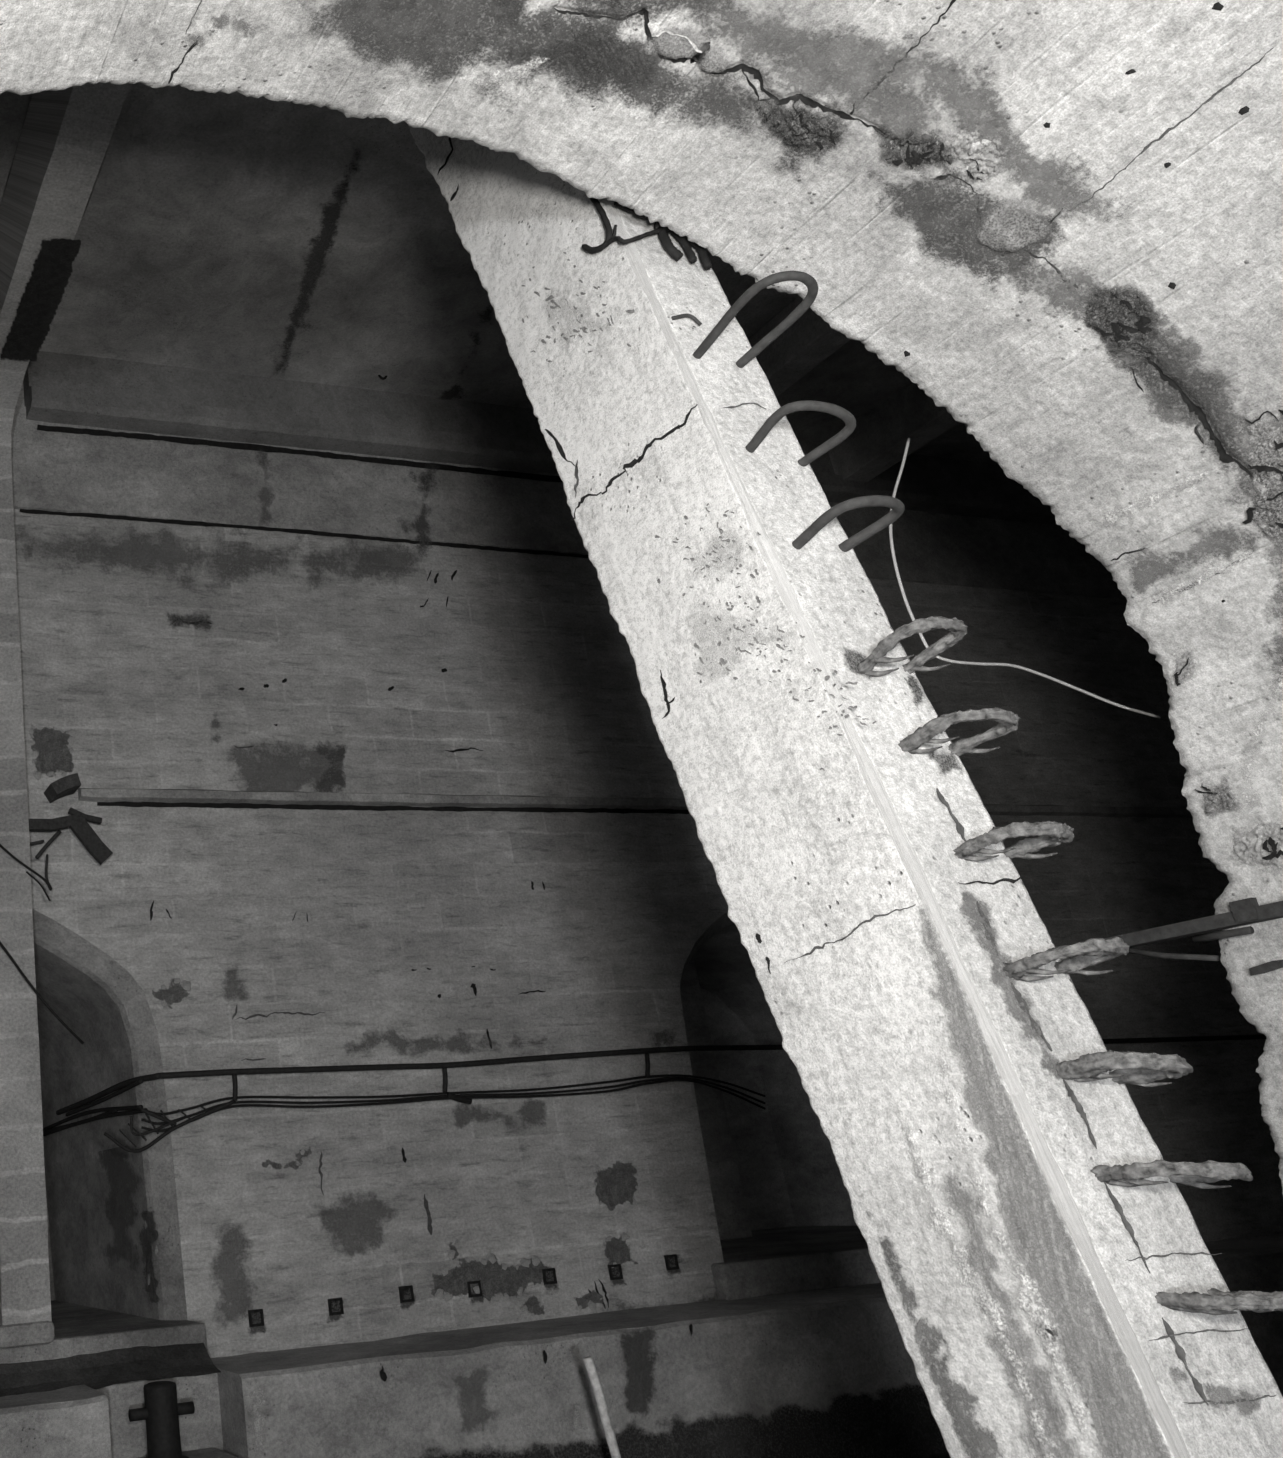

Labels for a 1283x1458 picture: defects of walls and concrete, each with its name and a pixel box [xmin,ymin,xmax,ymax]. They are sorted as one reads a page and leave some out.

crack [554,0,956,145]
crack [999,47,1274,288]
crack [545,403,766,521]
leakage [312,0,1283,809]
spalling [1232,409,1283,553]
corrosion [845,649,870,679]
corrosion [907,676,923,705]
corrosion [929,750,962,773]
spalling [1195,779,1283,875]
crack [755,904,916,974]
leakage [907,892,1170,1458]
leakage [420,1239,1002,1458]